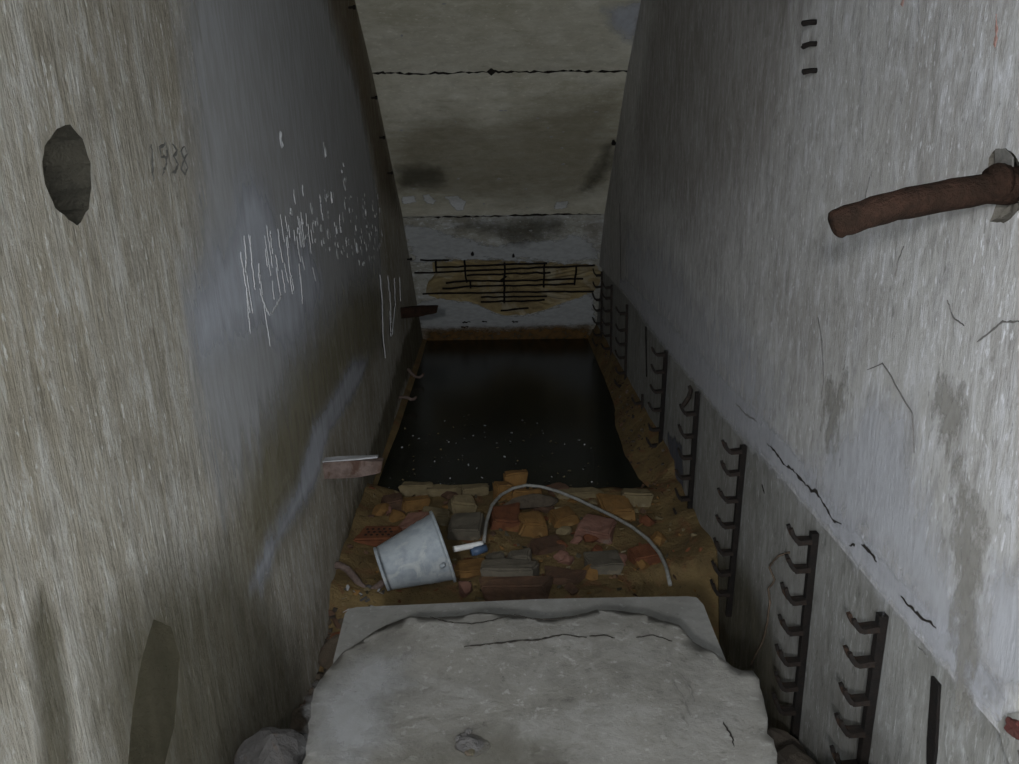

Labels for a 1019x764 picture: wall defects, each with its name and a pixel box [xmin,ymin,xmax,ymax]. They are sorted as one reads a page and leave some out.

water stain [191,0,393,578]
crack [867,363,915,453]
water stain [620,279,1019,717]
crack [767,443,877,562]
crack [429,614,695,727]
crack [901,596,936,628]